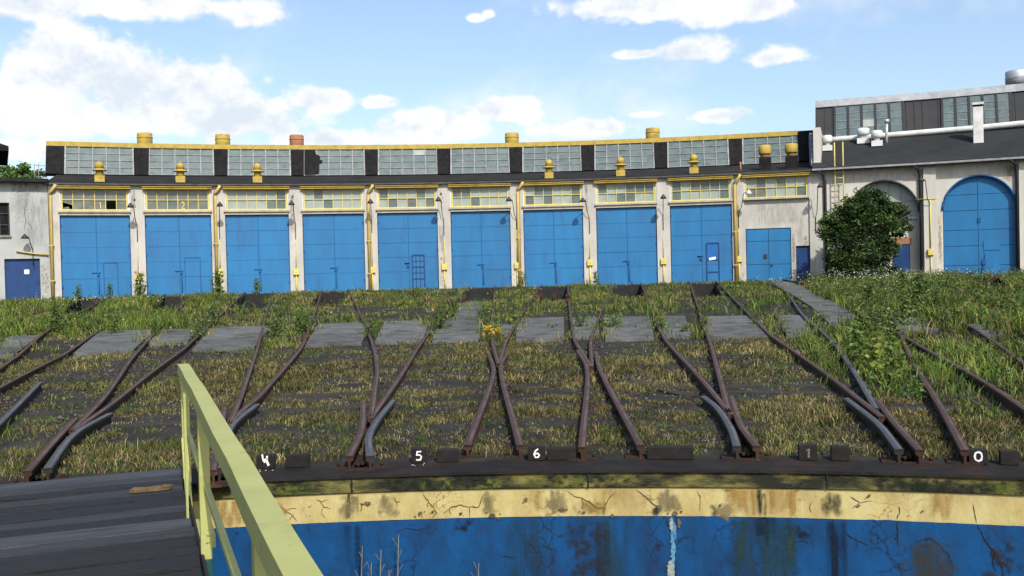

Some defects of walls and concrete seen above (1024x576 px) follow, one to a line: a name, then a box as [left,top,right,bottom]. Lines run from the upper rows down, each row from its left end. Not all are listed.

water stain [340,494,358,517]
crack [394,493,485,535]
crack [569,491,677,576]
peeling [667,510,682,576]
water stain [823,496,846,576]
crack [973,505,1006,576]